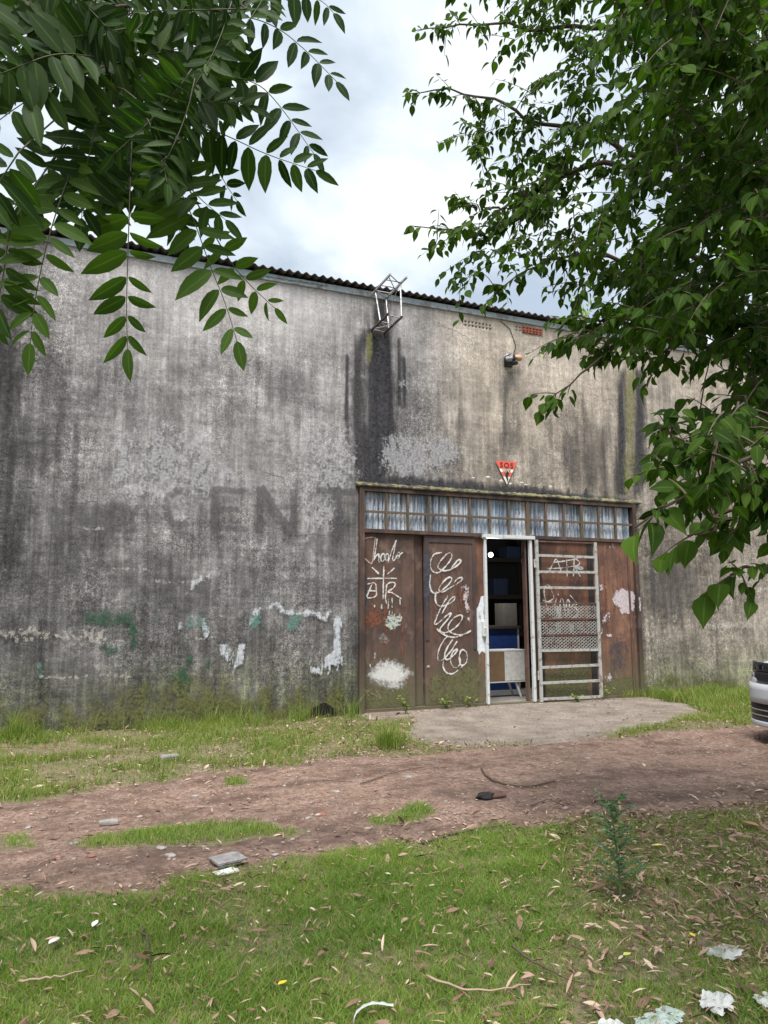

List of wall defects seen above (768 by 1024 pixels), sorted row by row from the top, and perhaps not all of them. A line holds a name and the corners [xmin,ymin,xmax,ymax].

water stain [297,302,647,539]
corrosion [365,567,404,661]